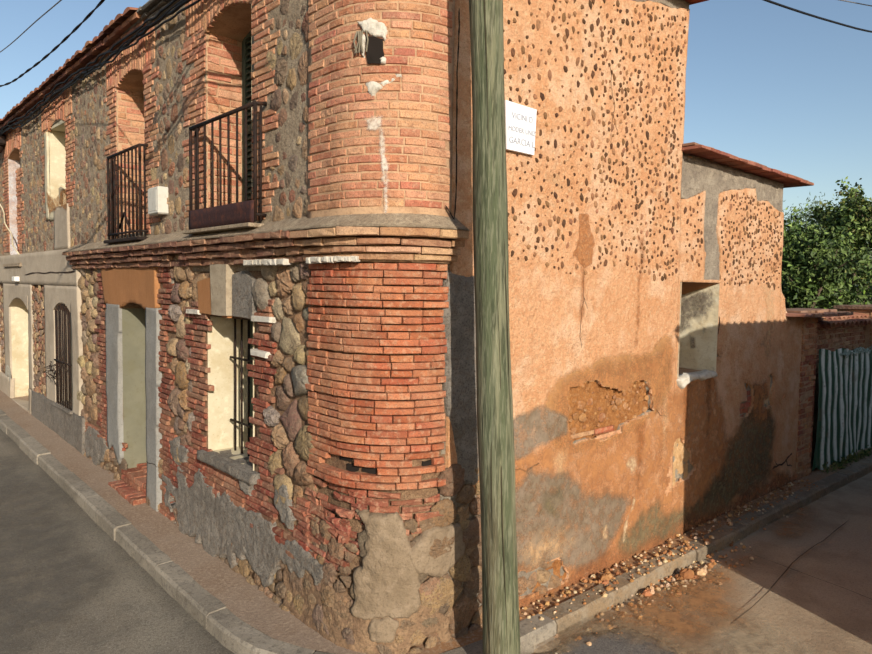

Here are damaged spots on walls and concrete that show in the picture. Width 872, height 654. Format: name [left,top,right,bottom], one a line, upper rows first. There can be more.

spalling [353,18,388,65]
leakage [367,118,388,212]
flaking render [568,380,654,442]
spalling [339,456,377,474]
leakage [513,336,795,607]
flaking render [669,438,693,486]